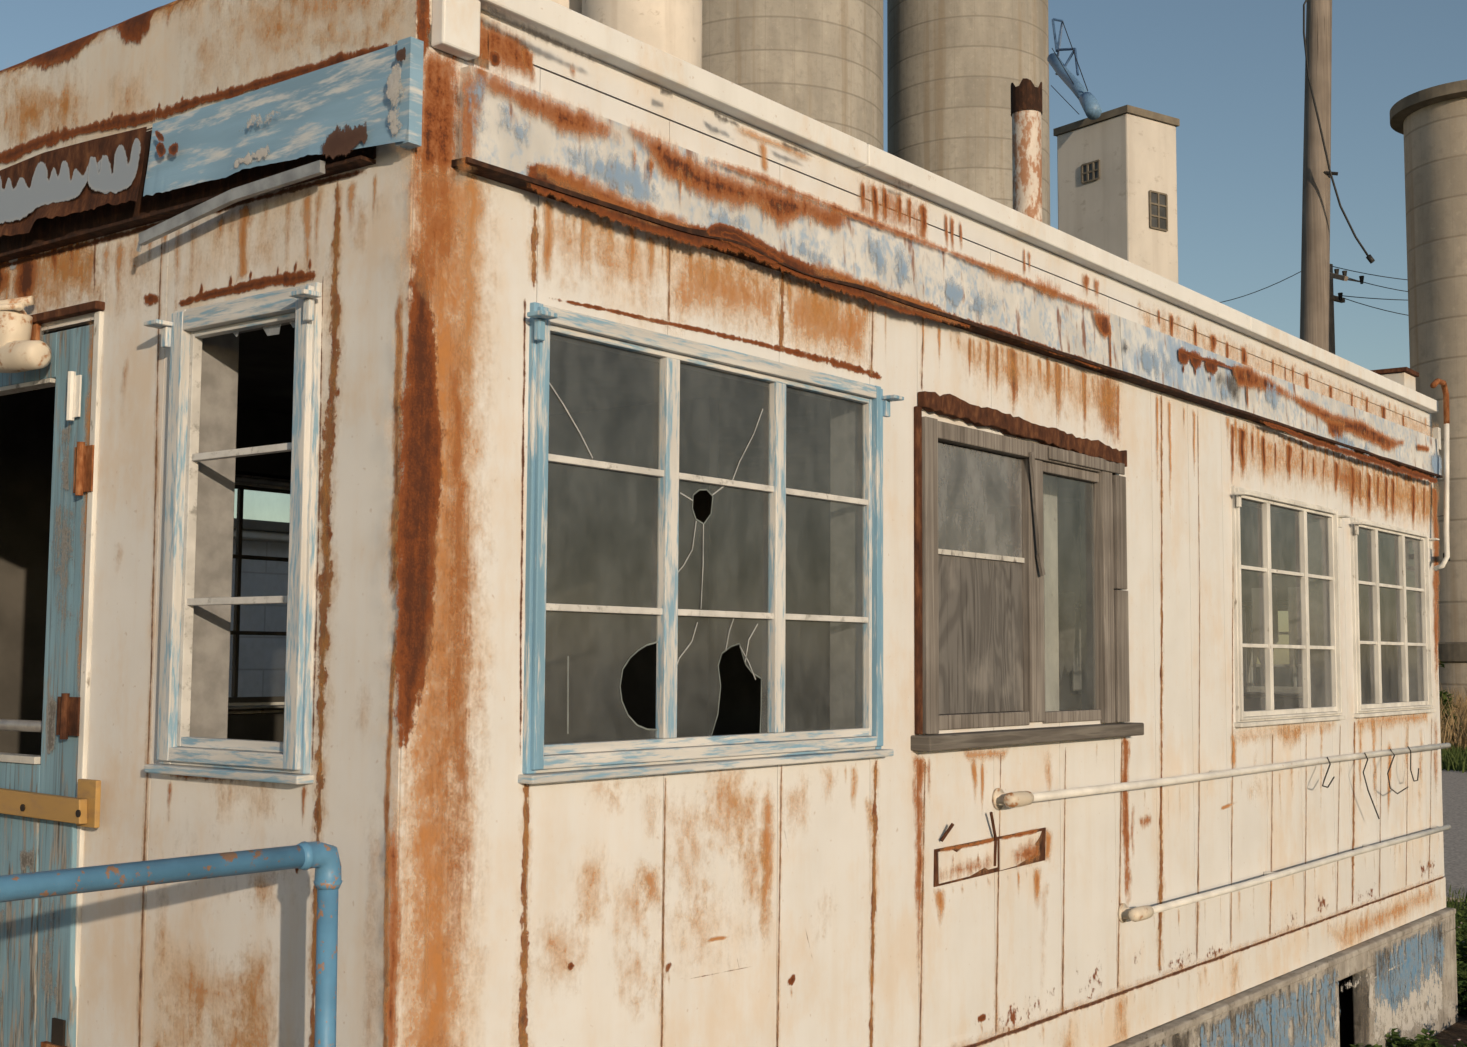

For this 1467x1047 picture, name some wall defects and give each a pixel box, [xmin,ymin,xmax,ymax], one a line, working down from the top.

peeling [0,131,178,224]
rust [0,25,397,164]
peeling [234,144,270,168]
peeling [321,122,368,159]
peeling [386,47,406,137]
rust [1011,78,1043,117]
rust [179,170,376,842]
rust [383,0,610,1047]
rust [520,126,1119,751]
rust [943,397,1443,1047]
rust [913,758,944,1047]
peeling [1193,923,1445,1047]